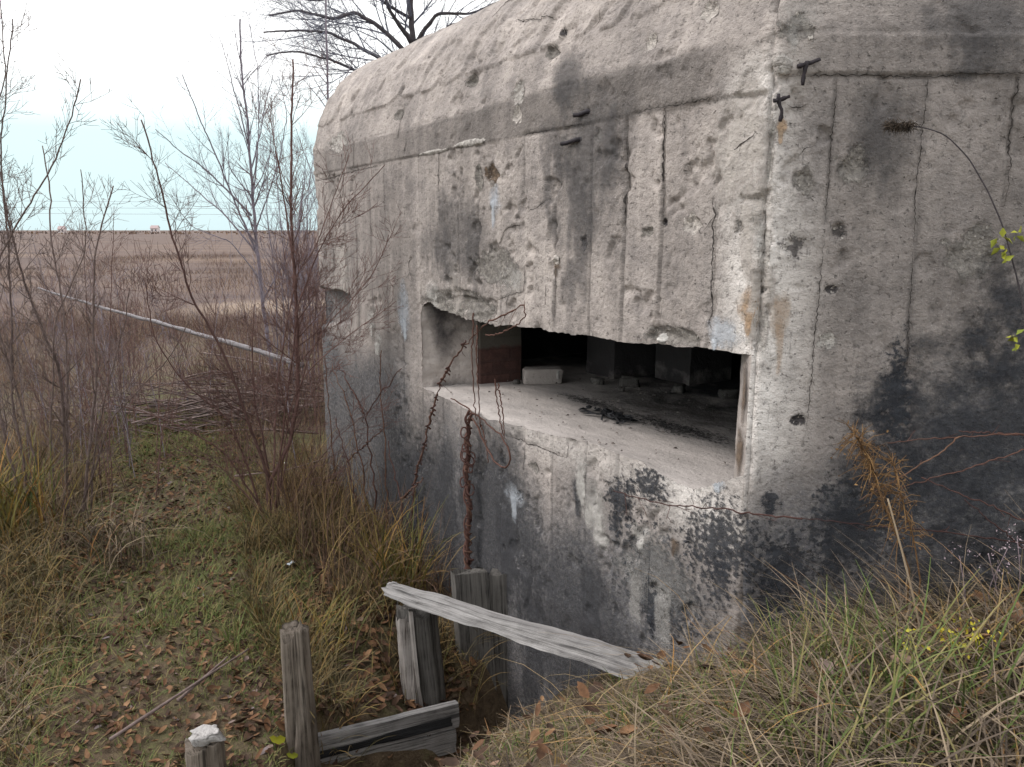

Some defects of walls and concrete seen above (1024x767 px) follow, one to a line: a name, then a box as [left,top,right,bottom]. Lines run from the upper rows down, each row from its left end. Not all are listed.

spalling [474,163,500,191]
crack [639,96,717,223]
crack [702,196,717,331]
crack [786,71,1024,427]
damp [971,261,1024,380]
damp [817,372,924,594]